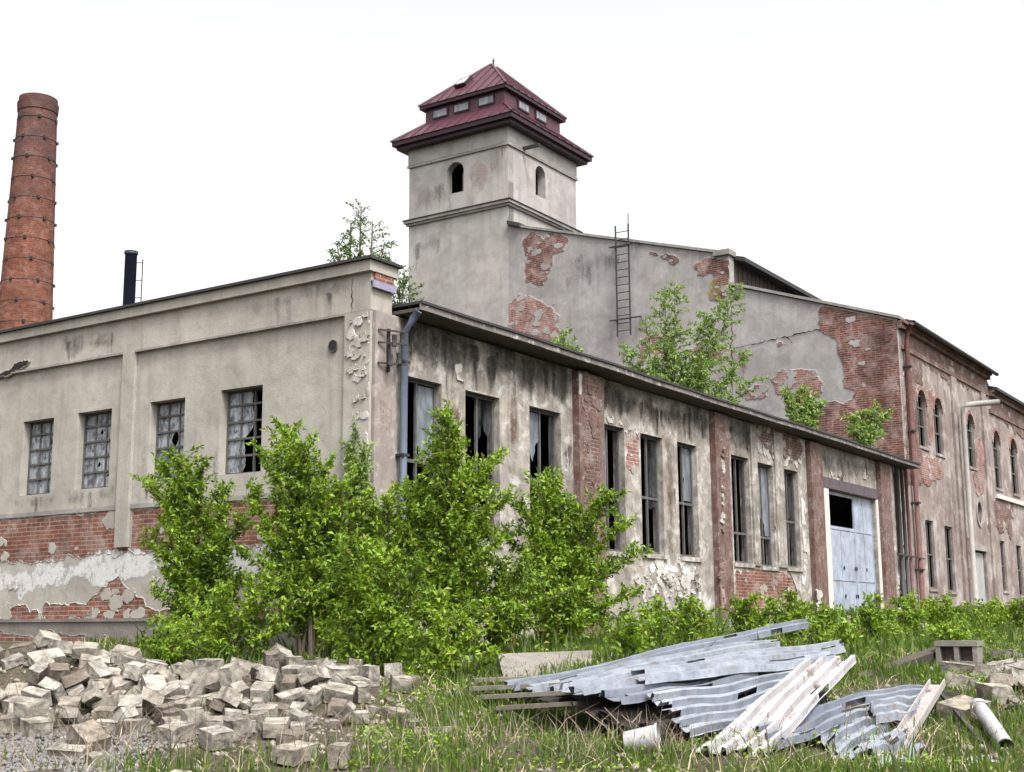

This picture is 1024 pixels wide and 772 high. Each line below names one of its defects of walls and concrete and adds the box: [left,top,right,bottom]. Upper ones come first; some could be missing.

flaking render [0,498,181,645]
flaking render [191,498,294,578]